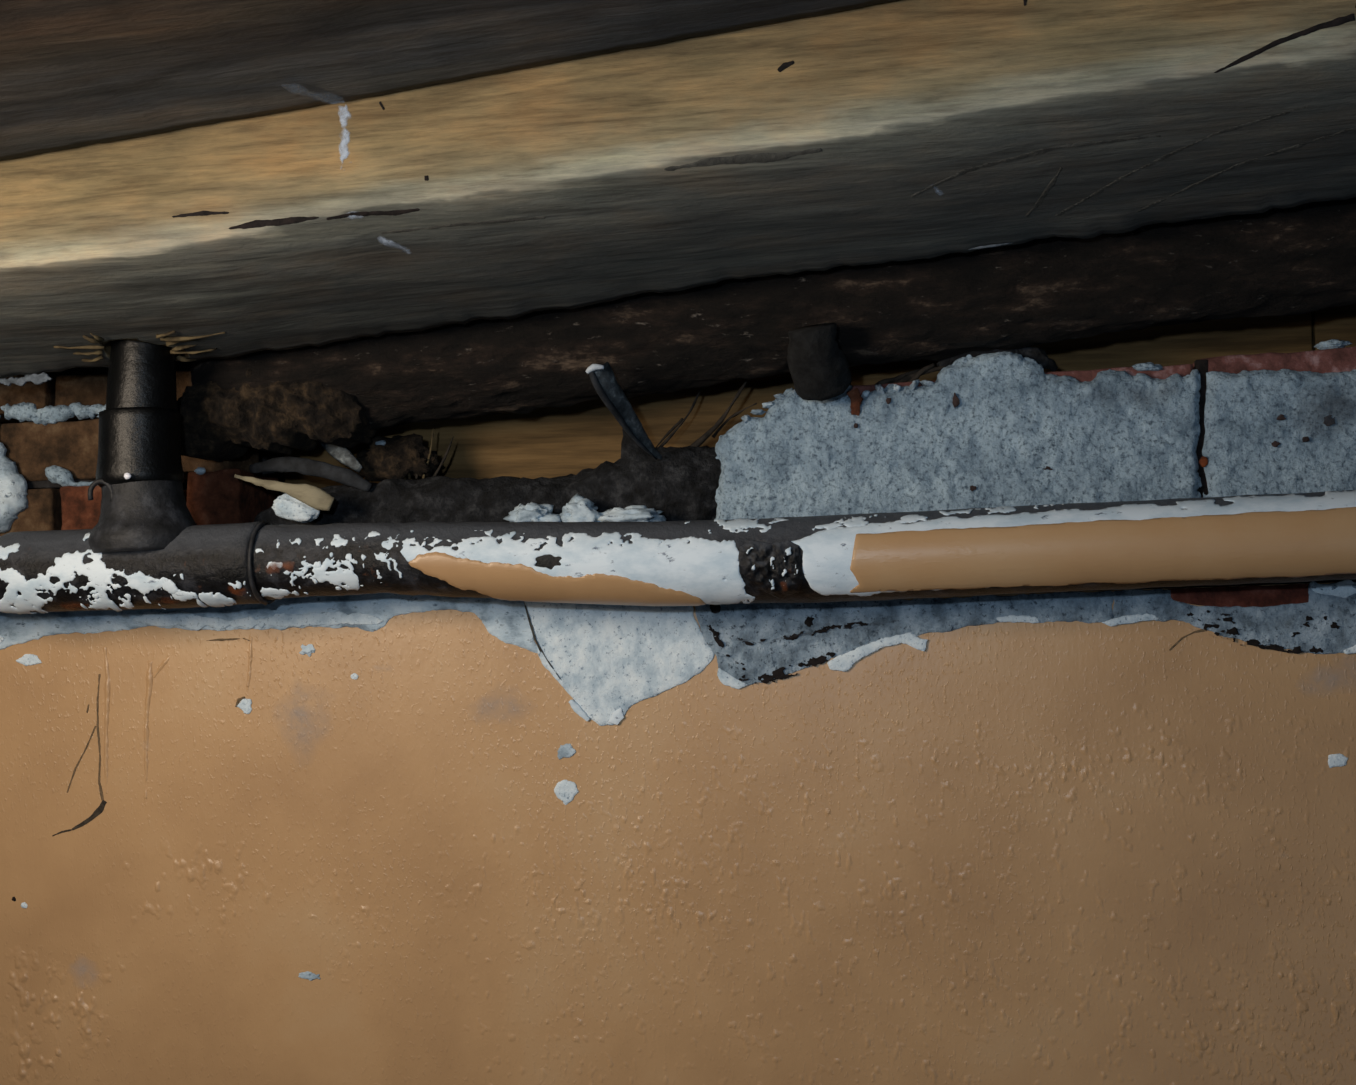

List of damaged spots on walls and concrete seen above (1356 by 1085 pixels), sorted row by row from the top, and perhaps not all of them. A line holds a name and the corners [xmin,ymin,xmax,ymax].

crack [1194,359,1208,497]
spalling [0,351,1356,726]
crack [52,674,107,836]